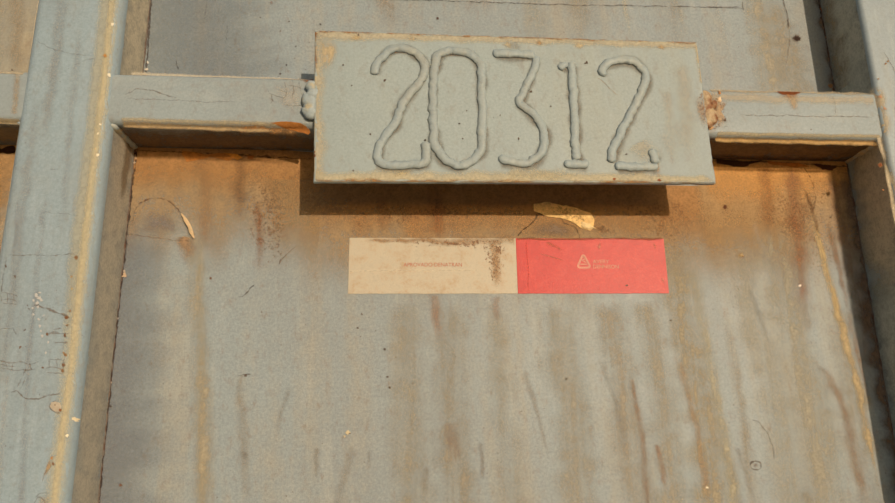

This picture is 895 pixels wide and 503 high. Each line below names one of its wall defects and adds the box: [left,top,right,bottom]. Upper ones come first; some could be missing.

corrosion [0,126,19,198]
peeling [140,198,195,240]
corrosion [122,23,895,457]
spalling [518,202,596,236]